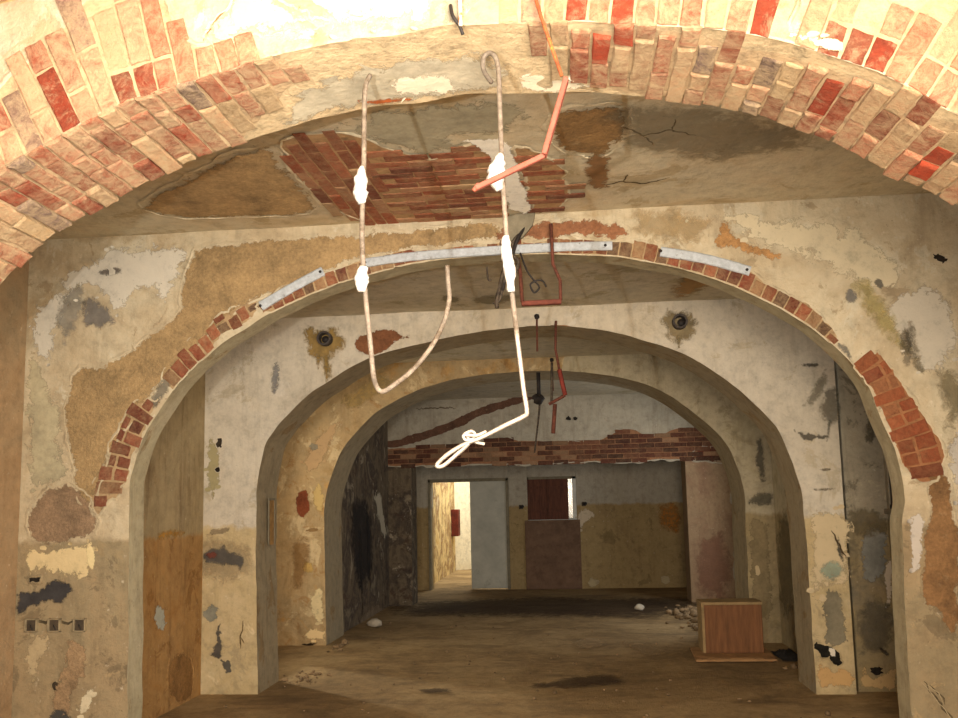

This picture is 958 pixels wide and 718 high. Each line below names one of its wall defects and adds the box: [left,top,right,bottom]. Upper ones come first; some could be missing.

damp [608,109,799,161]
spalling [0,0,839,585]
peeling [685,213,958,374]
damp [351,498,373,609]
peeling [806,504,854,603]
spalling [853,350,958,638]